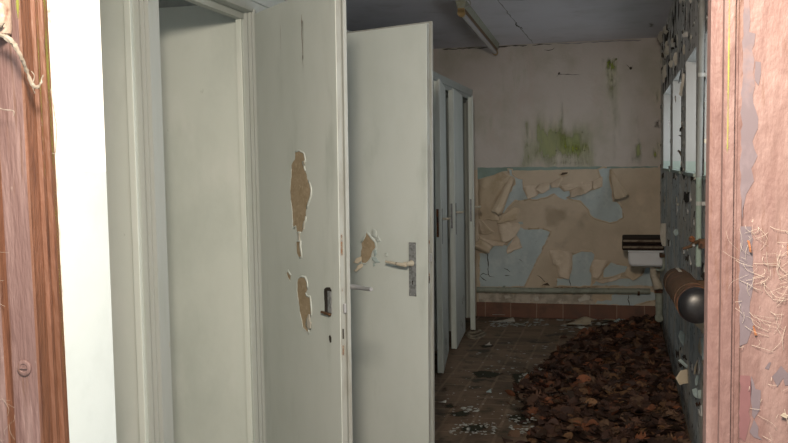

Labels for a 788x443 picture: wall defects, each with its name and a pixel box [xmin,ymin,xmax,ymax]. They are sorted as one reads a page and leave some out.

crack [443,0,641,50]
peeling [657,0,708,181]
peeling [290,151,310,232]
peeling [353,229,381,272]
peeling [475,166,655,305]
peeling [660,223,679,248]
peeling [287,272,312,332]
peeling [675,323,704,417]